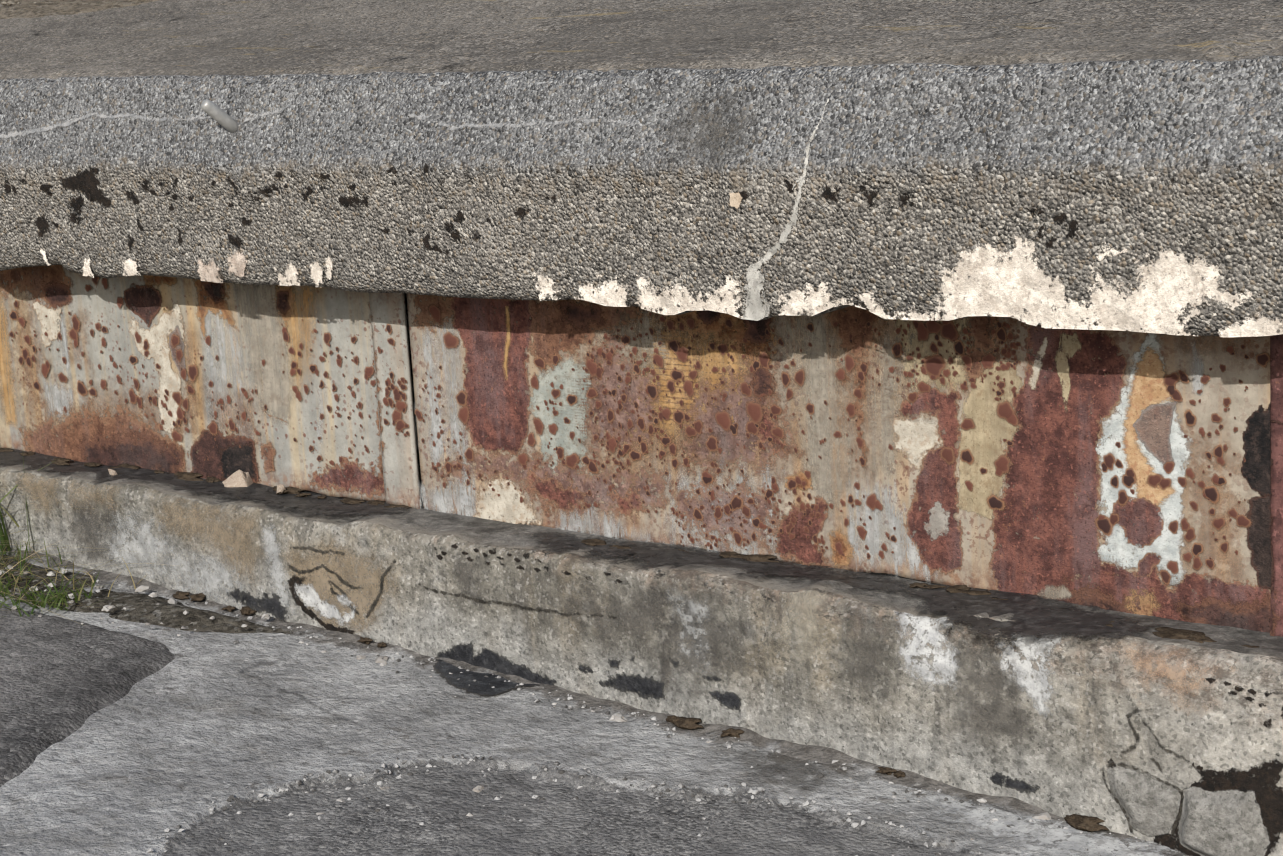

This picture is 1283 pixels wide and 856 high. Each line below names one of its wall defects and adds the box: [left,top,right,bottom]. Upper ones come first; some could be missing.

water stain [532,266,744,319]
water stain [775,236,1283,337]
corrosion [0,265,276,482]
peeling [1193,359,1203,392]
corrosion [270,285,1280,636]
peeling [1095,333,1194,586]
crack [1102,708,1187,836]
spalling [1107,754,1283,856]